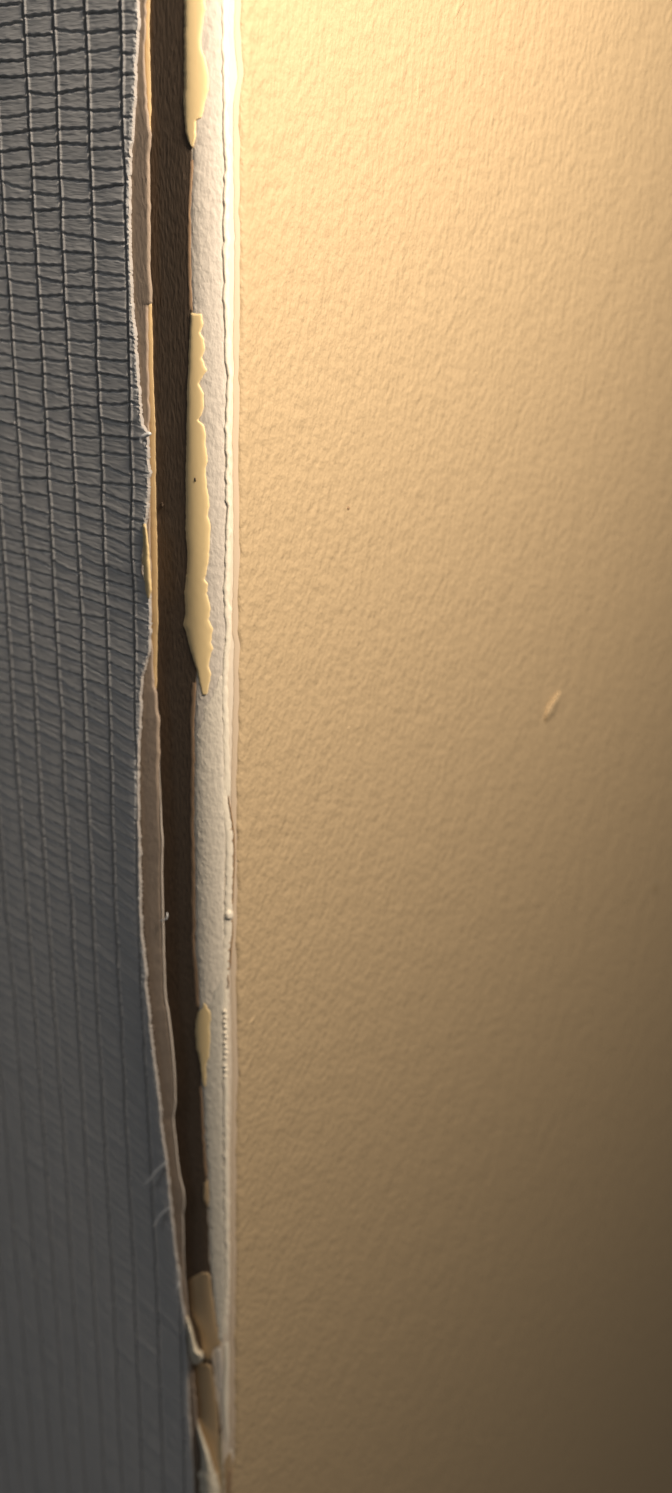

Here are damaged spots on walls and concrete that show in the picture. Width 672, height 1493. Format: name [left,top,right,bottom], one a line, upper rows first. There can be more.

peeling [142,303,158,690]
flaking render [183,0,227,1493]
crack [227,799,235,988]